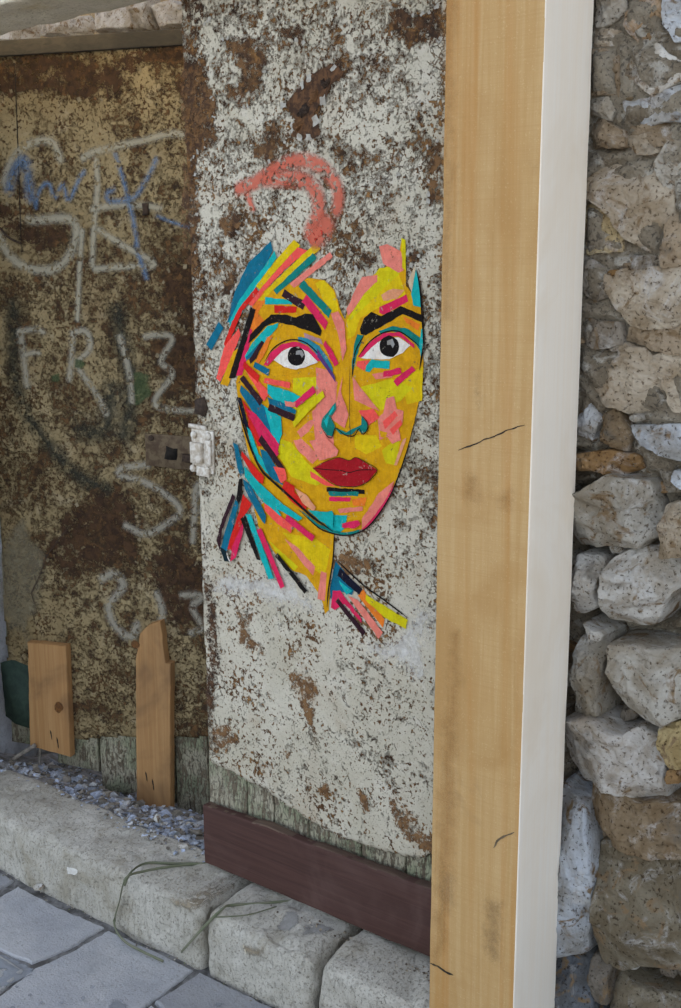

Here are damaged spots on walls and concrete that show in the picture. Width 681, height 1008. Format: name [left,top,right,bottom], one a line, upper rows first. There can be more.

crack [459,425,524,450]
corrosion [288,671,319,734]
corrosion [389,784,432,854]